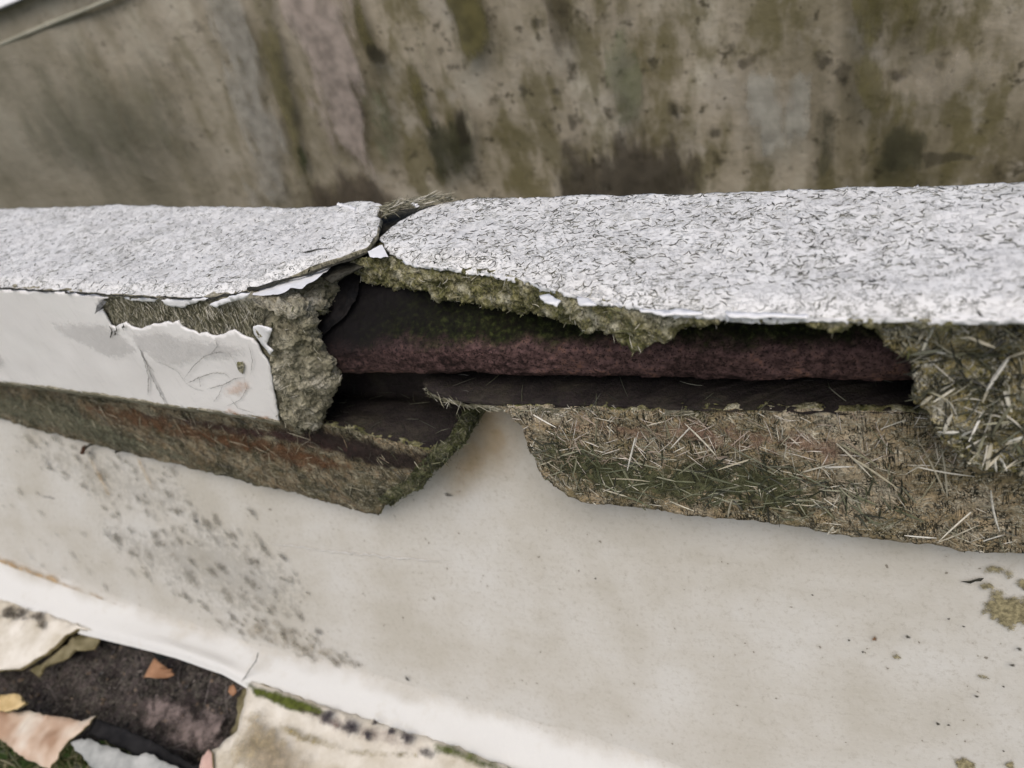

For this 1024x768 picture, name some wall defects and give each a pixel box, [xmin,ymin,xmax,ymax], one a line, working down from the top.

leakage [210,0,395,219]
leakage [406,64,472,181]
leakage [531,0,572,50]
leakage [559,115,701,196]
leakage [738,52,809,154]
leakage [815,54,851,86]
leakage [880,126,975,171]
spalling [95,266,343,431]
crack [0,189,457,300]
spalling [350,242,961,353]